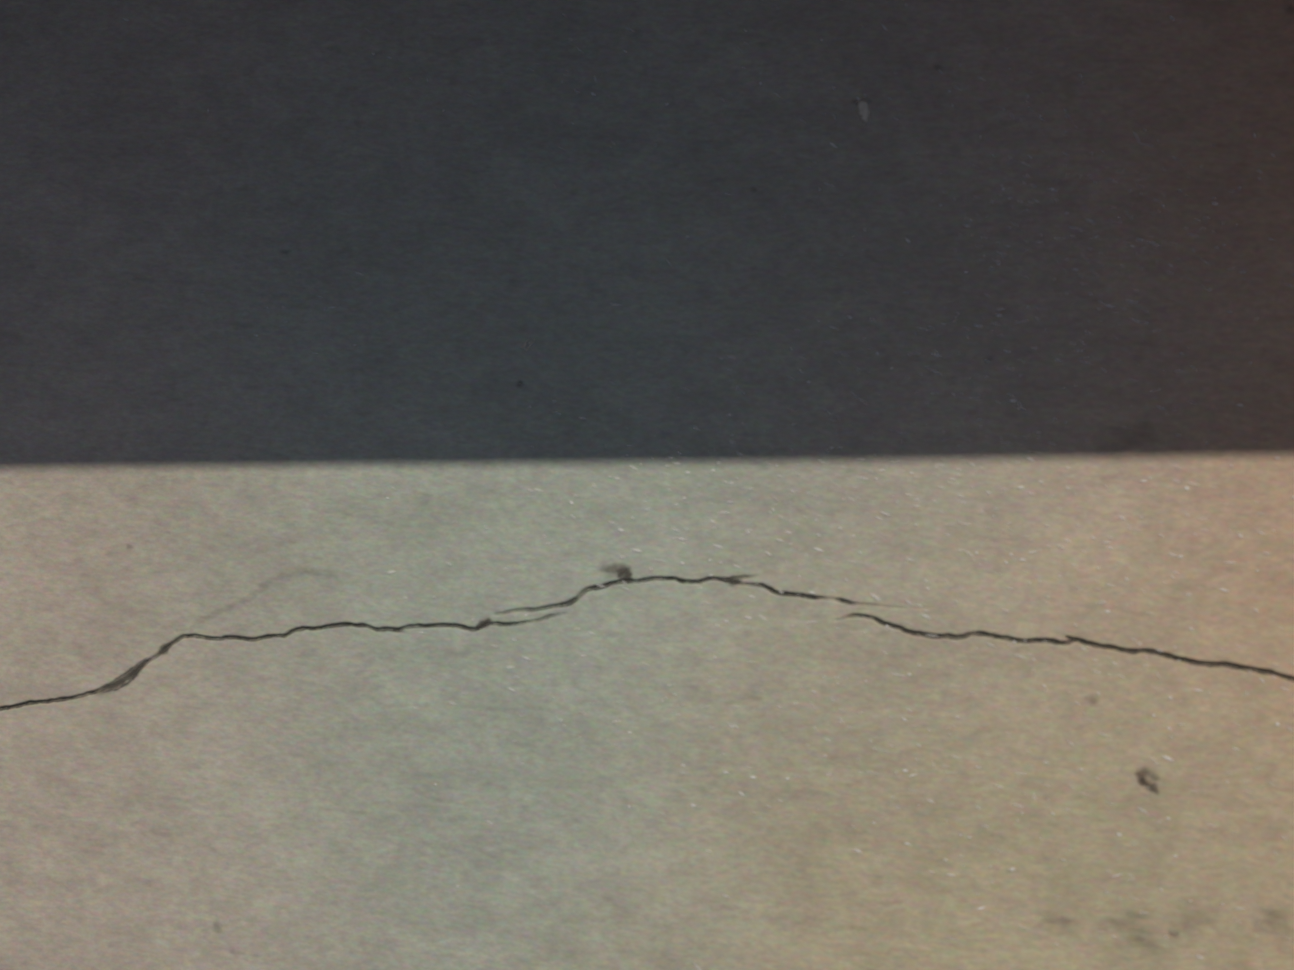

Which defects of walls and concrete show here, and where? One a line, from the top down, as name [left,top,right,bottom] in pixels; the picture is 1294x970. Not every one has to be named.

crack [0,567,1294,710]